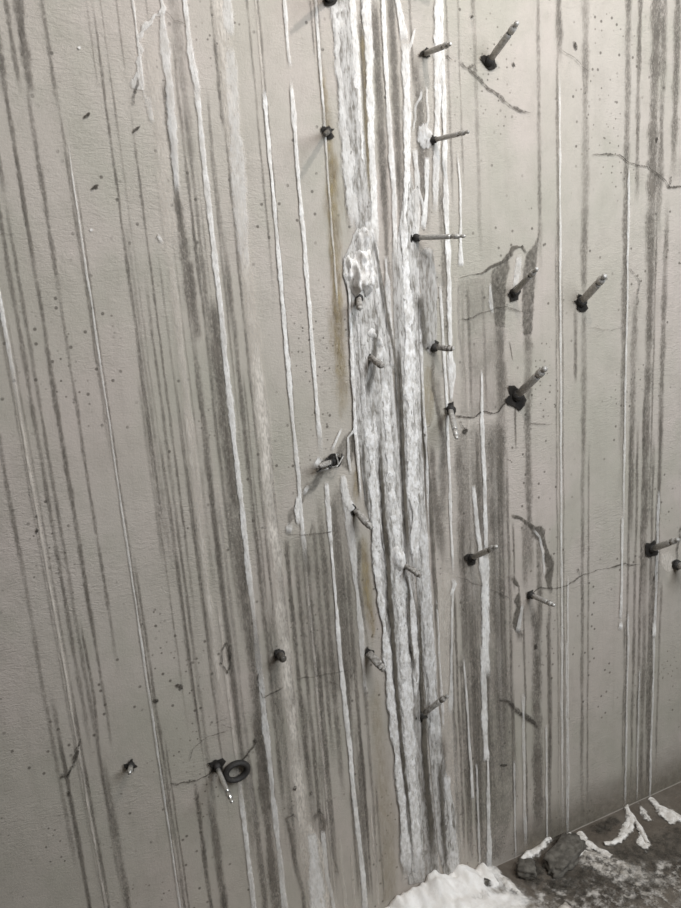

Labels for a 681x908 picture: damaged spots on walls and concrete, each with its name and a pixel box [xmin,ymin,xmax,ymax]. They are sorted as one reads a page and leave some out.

water stain [0,0,32,86]
crack [447,55,527,112]
water stain [4,84,34,256]
crack [595,153,681,188]
water stain [0,283,13,348]
water stain [47,347,76,518]
water stain [160,0,372,908]
water stain [331,0,514,884]
crack [457,403,506,429]
water stain [528,0,681,850]
water stain [50,571,98,722]
water stain [77,534,93,624]